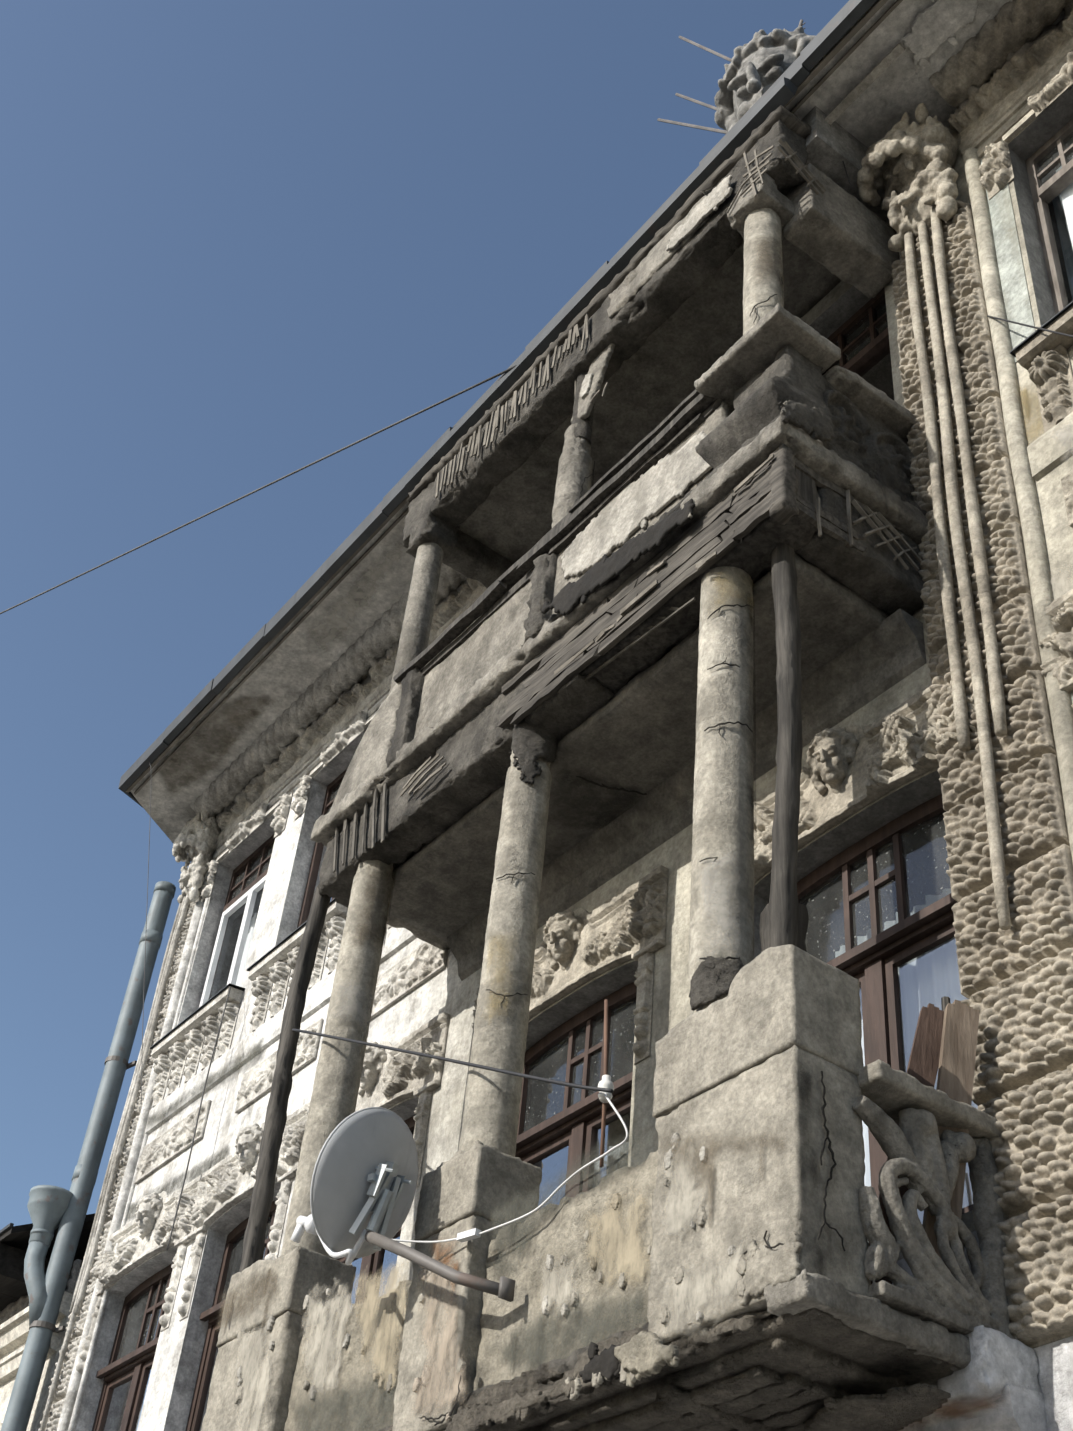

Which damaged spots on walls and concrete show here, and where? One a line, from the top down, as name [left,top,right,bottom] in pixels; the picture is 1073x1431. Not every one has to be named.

flaking render [902,0,979,67]
flaking render [541,431,712,616]
crack [707,604,753,619]
crack [707,657,740,670]
crack [704,721,753,736]
crack [486,989,527,1008]
flaking render [663,1132,708,1236]
crack [818,1071,845,1251]
flaking render [583,1193,652,1289]
crack [743,1230,784,1255]
flaking render [302,1231,803,1431]
spalling [803,1383,951,1431]